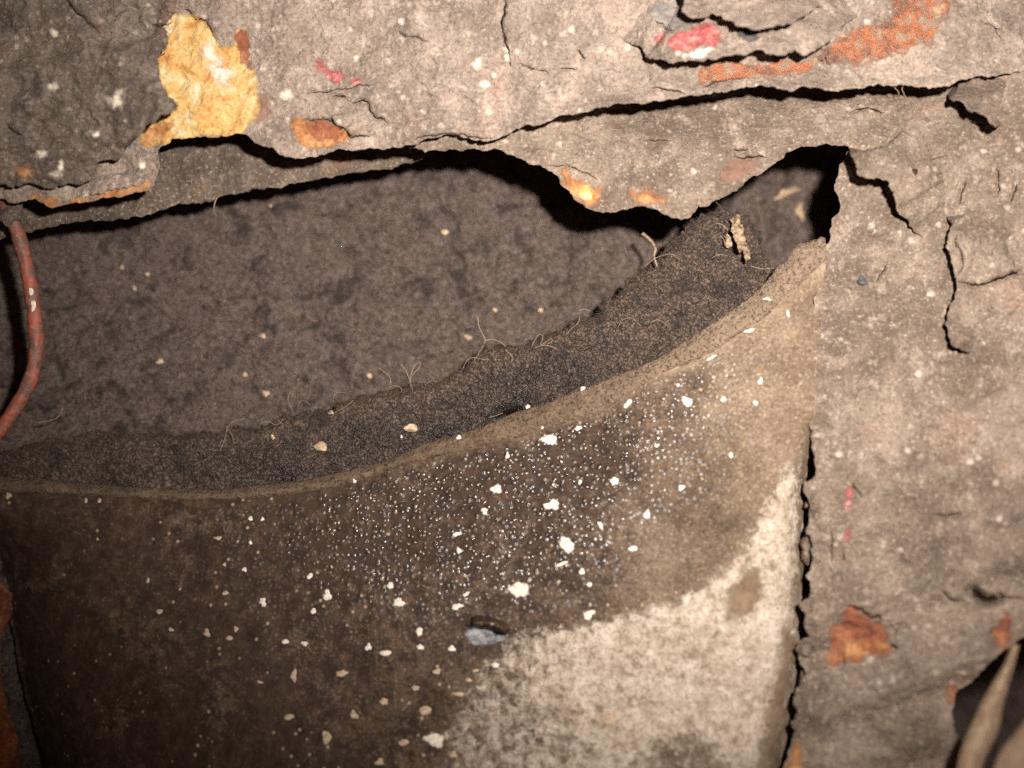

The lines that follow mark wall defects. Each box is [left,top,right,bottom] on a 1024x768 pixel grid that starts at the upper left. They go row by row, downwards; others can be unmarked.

corrosion [623,0,950,84]
corrosion [0,0,260,208]
corrosion [290,108,371,150]
crack [299,82,386,138]
crack [414,132,491,140]
crack [652,76,746,94]
crack [733,149,766,159]
crack [996,168,1017,206]
crack [955,235,1022,286]
water stain [733,568,759,615]
corrosion [826,605,893,666]
water stain [757,631,794,768]